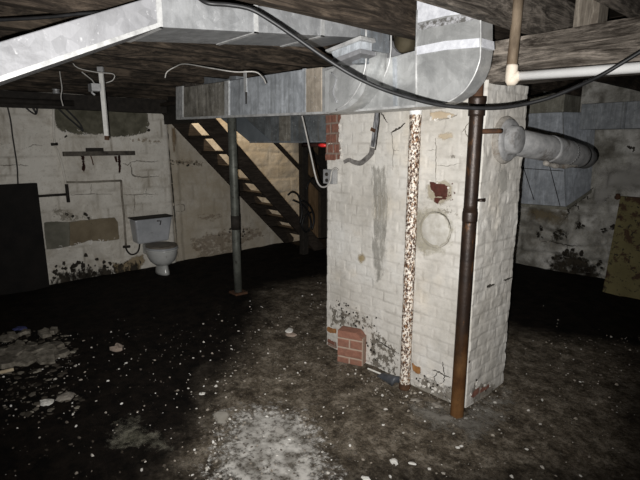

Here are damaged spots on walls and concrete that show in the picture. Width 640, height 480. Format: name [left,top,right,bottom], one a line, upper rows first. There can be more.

flaking render [325,115,343,160]
flaking render [428,180,457,216]
leakage [371,168,388,280]
leakage [50,253,145,284]
leakage [548,248,604,278]
leakage [328,300,398,375]